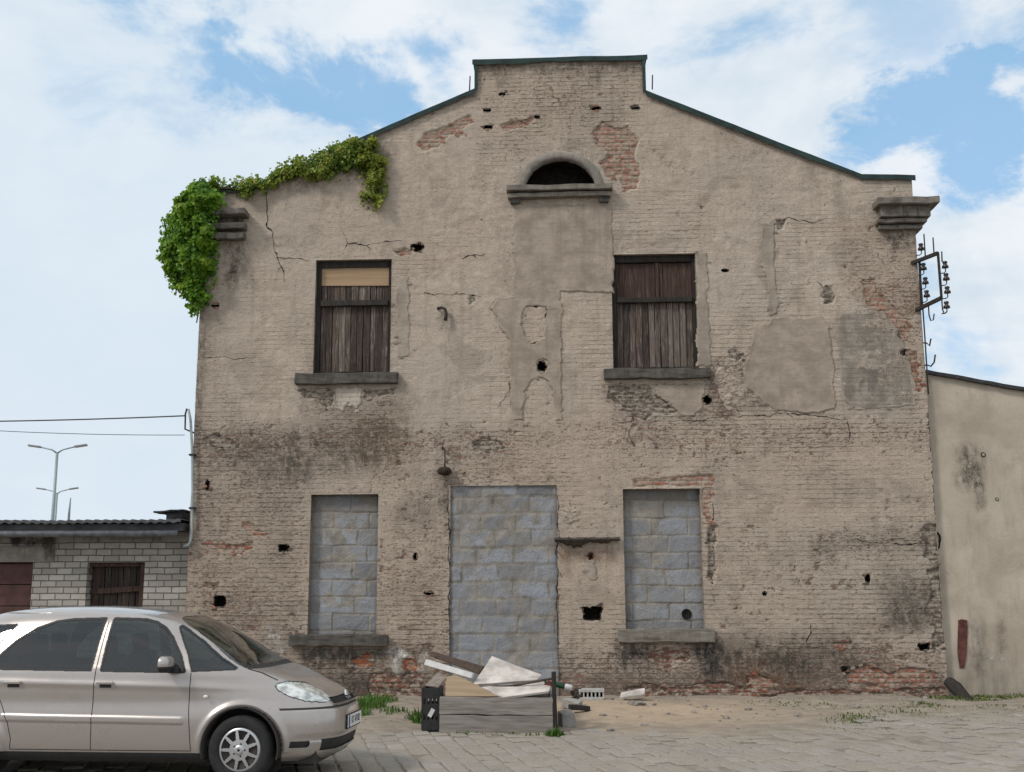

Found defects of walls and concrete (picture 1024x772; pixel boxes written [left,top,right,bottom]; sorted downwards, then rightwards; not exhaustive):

spalling [417,108,540,151]
spalling [589,104,641,192]
crack [266,194,307,273]
peeling [836,279,926,410]
peeling [297,386,395,412]
spalling [607,382,712,421]
spalling [349,652,424,697]
spalling [627,647,946,697]